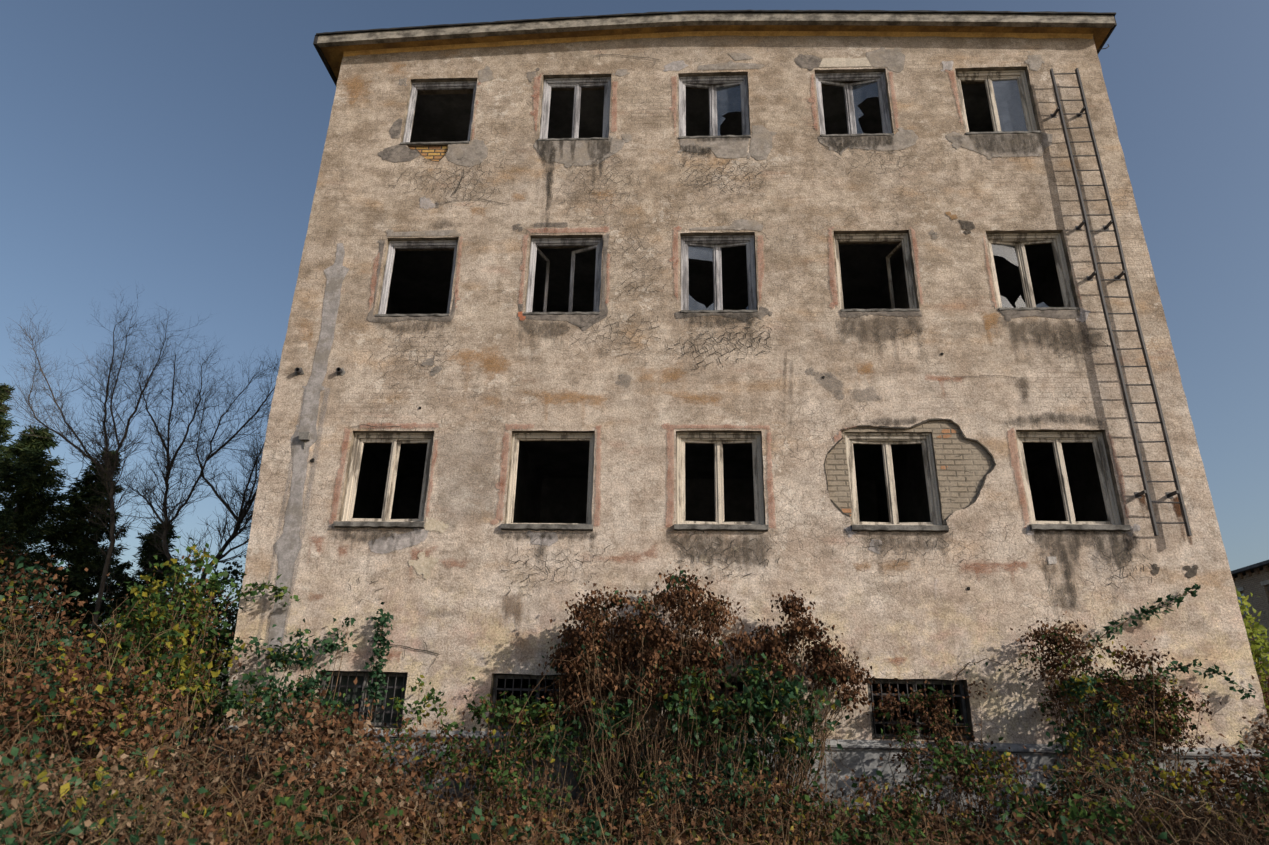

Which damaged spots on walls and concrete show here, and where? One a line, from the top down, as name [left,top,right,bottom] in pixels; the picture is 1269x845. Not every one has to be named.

spalling [408,145,448,162]
leakage [537,139,611,222]
crack [552,152,774,370]
leakage [838,316,922,343]
spalling [824,418,996,537]
crack [500,538,610,596]
leakage [668,532,766,564]
leakage [1034,530,1138,608]